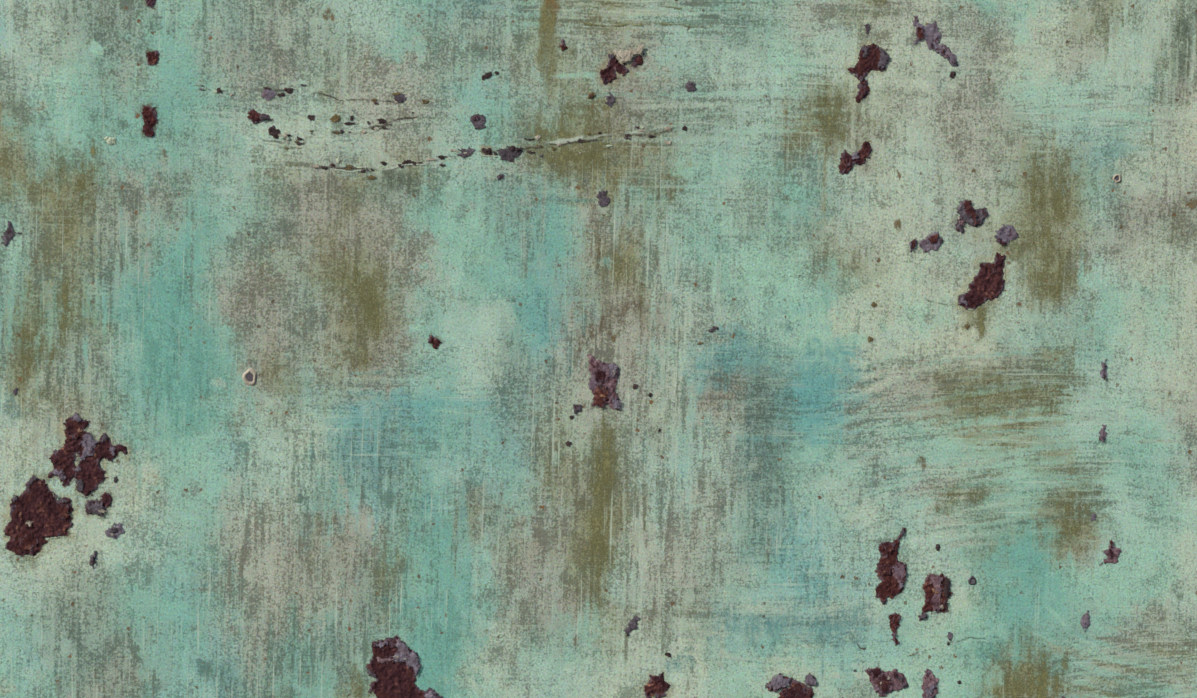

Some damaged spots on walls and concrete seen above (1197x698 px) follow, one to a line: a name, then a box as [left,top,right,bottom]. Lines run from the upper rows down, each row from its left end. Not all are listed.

peeling [105,523,125,539]